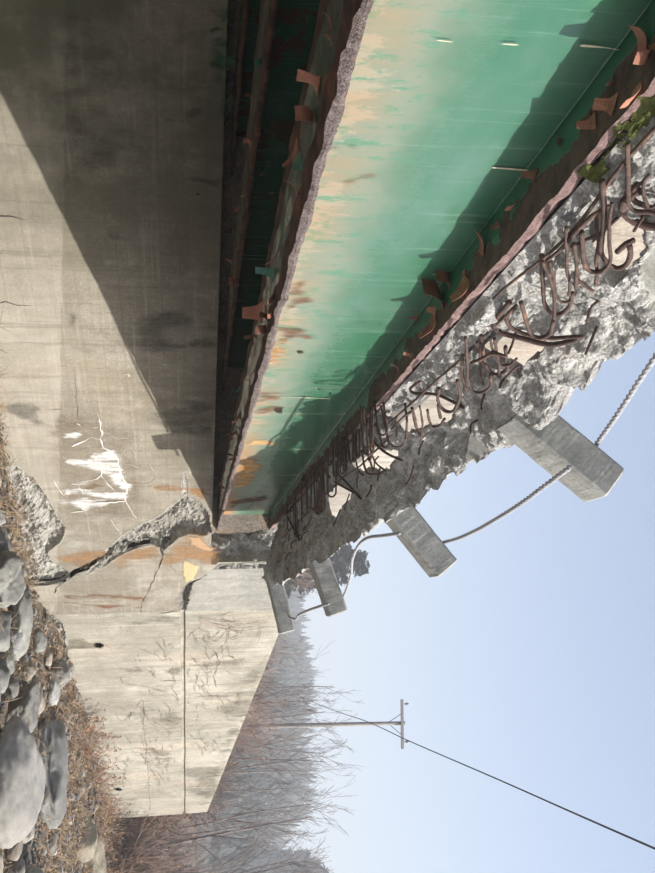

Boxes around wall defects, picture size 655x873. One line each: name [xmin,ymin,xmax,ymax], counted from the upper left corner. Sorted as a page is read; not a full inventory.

peeling [294,106,314,128]
peeling [296,69,321,97]
peeling [575,77,642,130]
peeling [628,25,655,65]
peeling [223,245,280,339]
spalling [262,115,655,587]
leakage [63,450,131,510]
spalling [7,463,216,586]
crack [33,378,198,614]
crack [105,611,262,802]